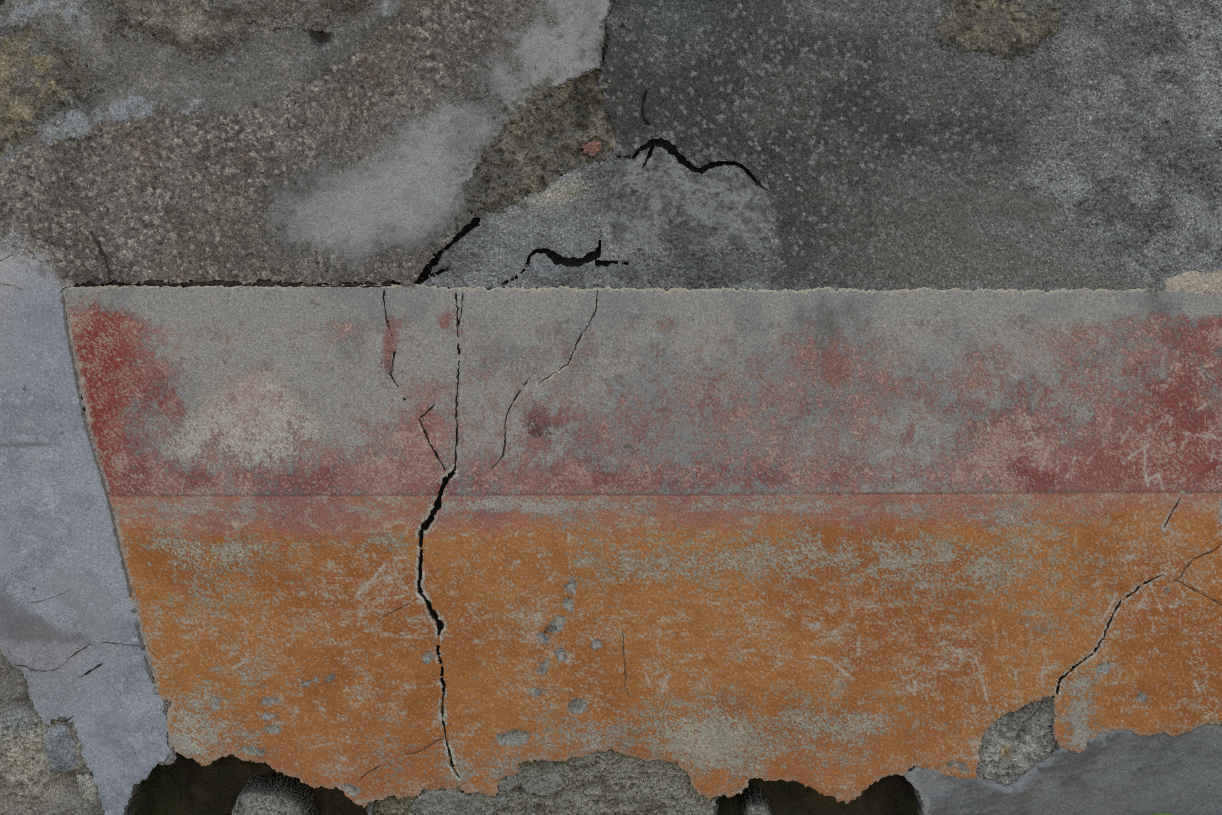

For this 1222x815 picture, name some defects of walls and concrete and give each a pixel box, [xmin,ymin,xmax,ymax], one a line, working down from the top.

spalling [463,55,771,254]
crack [618,90,768,191]
crack [491,240,630,469]
crack [15,217,480,781]
crack [1161,491,1185,531]
crack [1054,543,1222,702]
spalling [342,679,947,815]